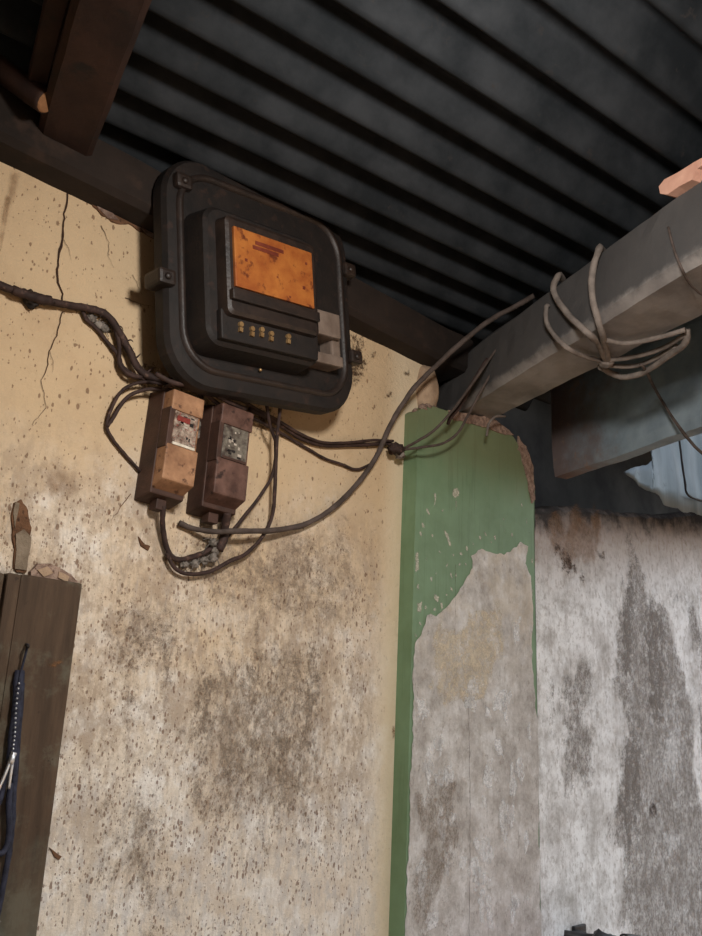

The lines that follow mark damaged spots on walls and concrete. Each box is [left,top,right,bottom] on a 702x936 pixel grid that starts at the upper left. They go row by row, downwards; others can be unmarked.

crack [32,193,70,425]
spalling [448,410,536,506]
damp [188,648,323,814]
peeling [405,531,542,936]
damp [564,664,592,787]
damp [614,544,702,936]